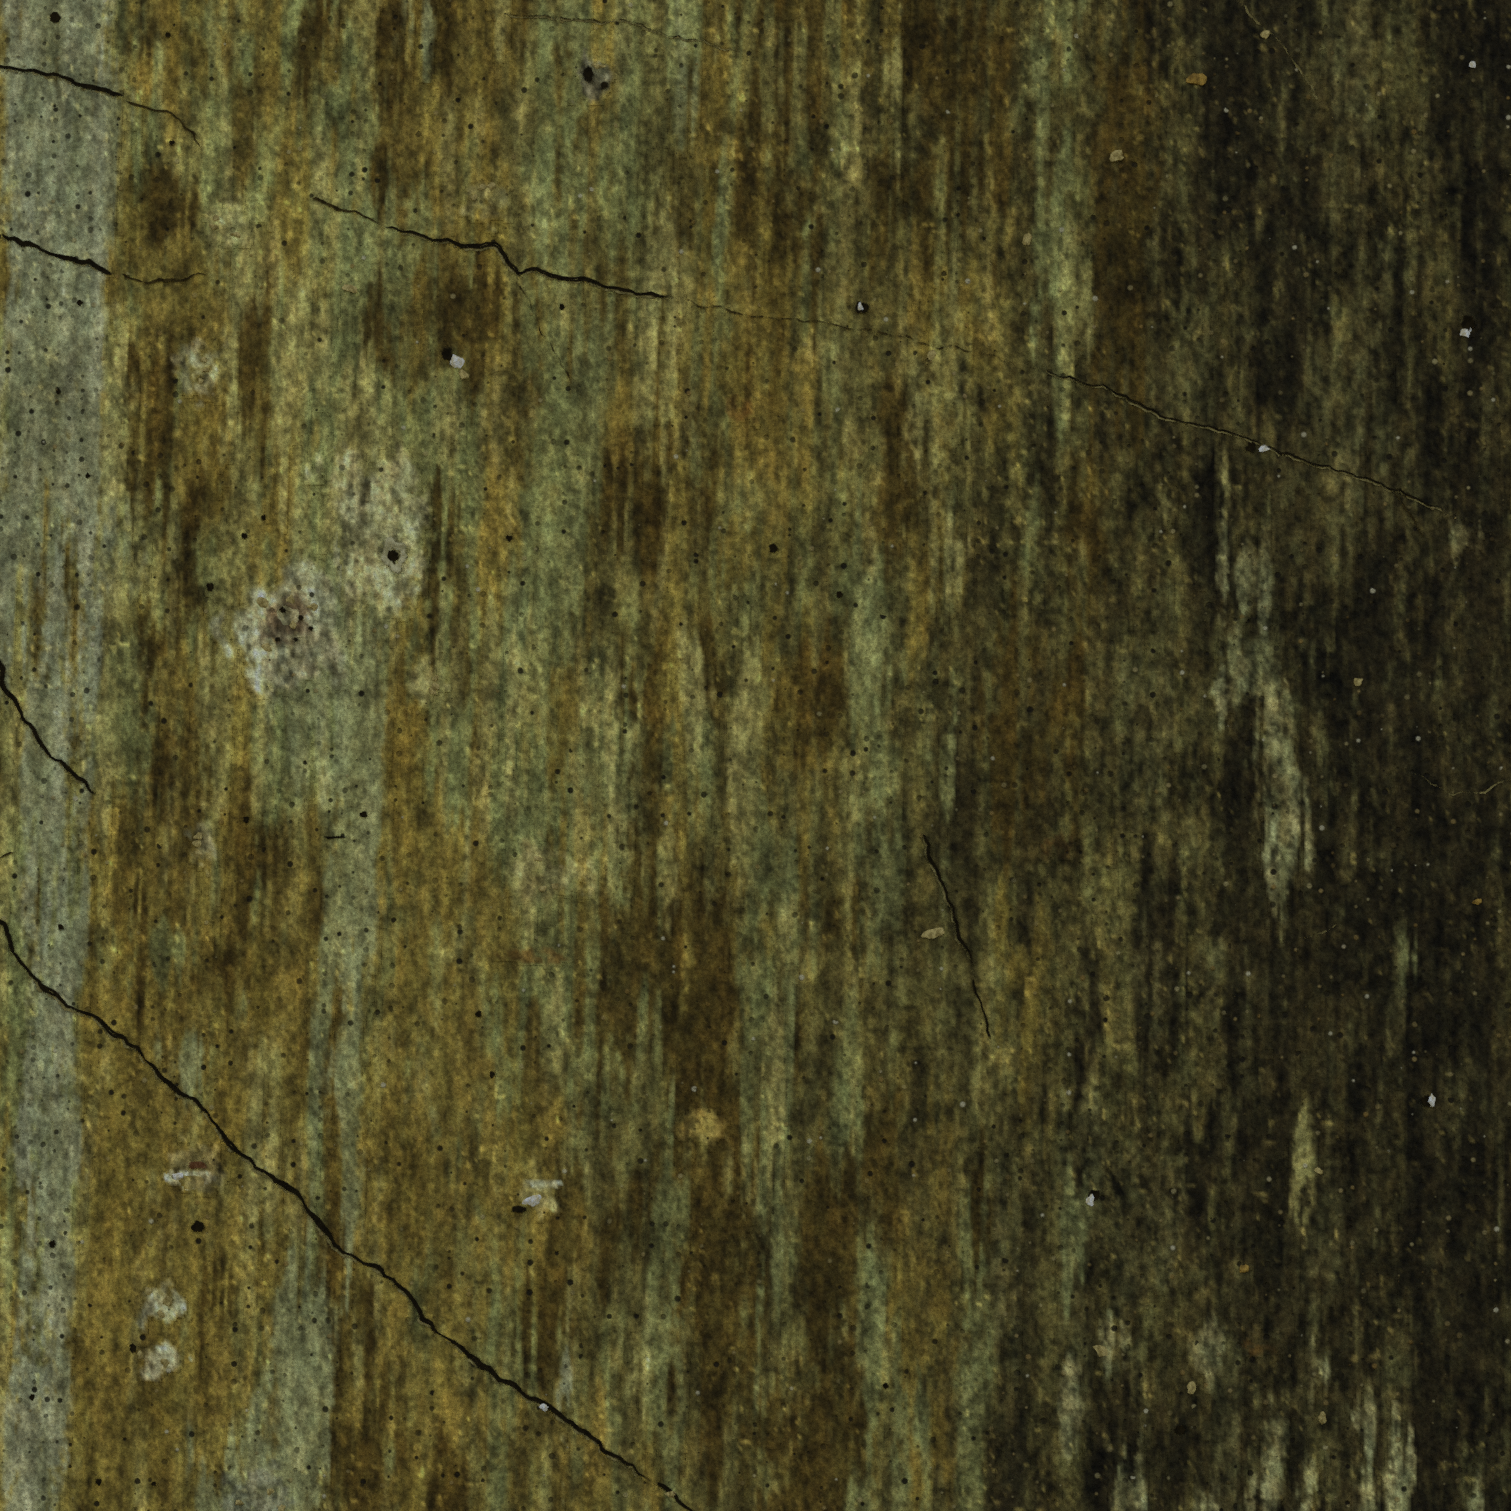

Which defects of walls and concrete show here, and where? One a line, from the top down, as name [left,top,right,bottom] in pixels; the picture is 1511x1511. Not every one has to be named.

crack [0,65,202,150]
crack [2,234,205,284]
crack [313,197,999,379]
crack [0,660,95,794]
crack [922,834,991,1038]
crack [0,919,693,1511]